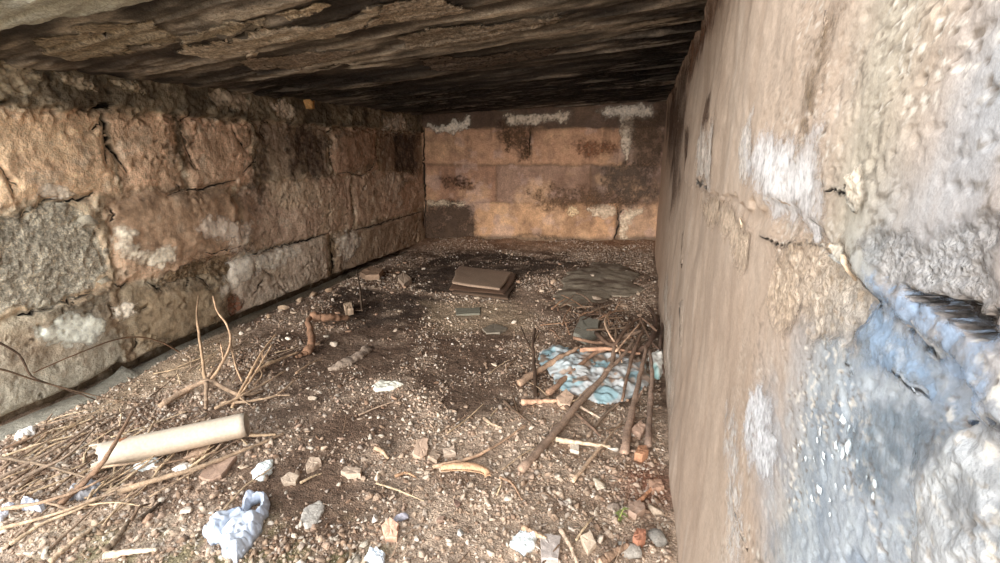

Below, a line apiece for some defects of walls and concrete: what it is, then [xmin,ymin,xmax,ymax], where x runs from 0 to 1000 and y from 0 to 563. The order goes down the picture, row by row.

crack [90,108,128,174]
crack [0,127,428,319]
crack [166,112,268,200]
damp [208,9,713,239]
damp [738,18,836,243]
crack [759,235,855,275]
crack [823,184,858,214]
spalling [856,212,1000,340]